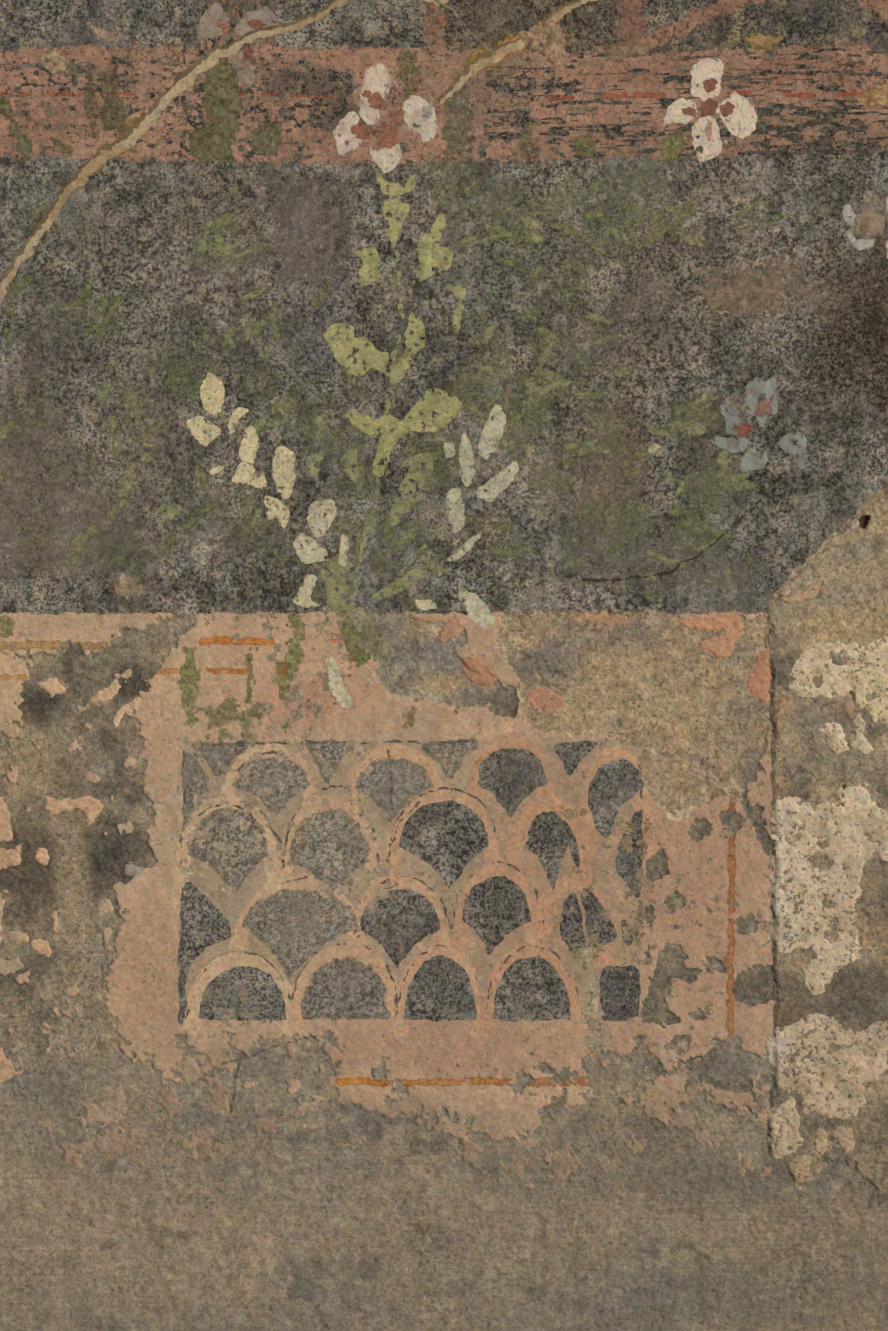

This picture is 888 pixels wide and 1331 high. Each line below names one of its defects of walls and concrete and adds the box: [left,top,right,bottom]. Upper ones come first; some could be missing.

crack [0,0,348,305]
crack [424,0,598,107]
crack [566,493,770,582]
peeling [0,482,888,1331]